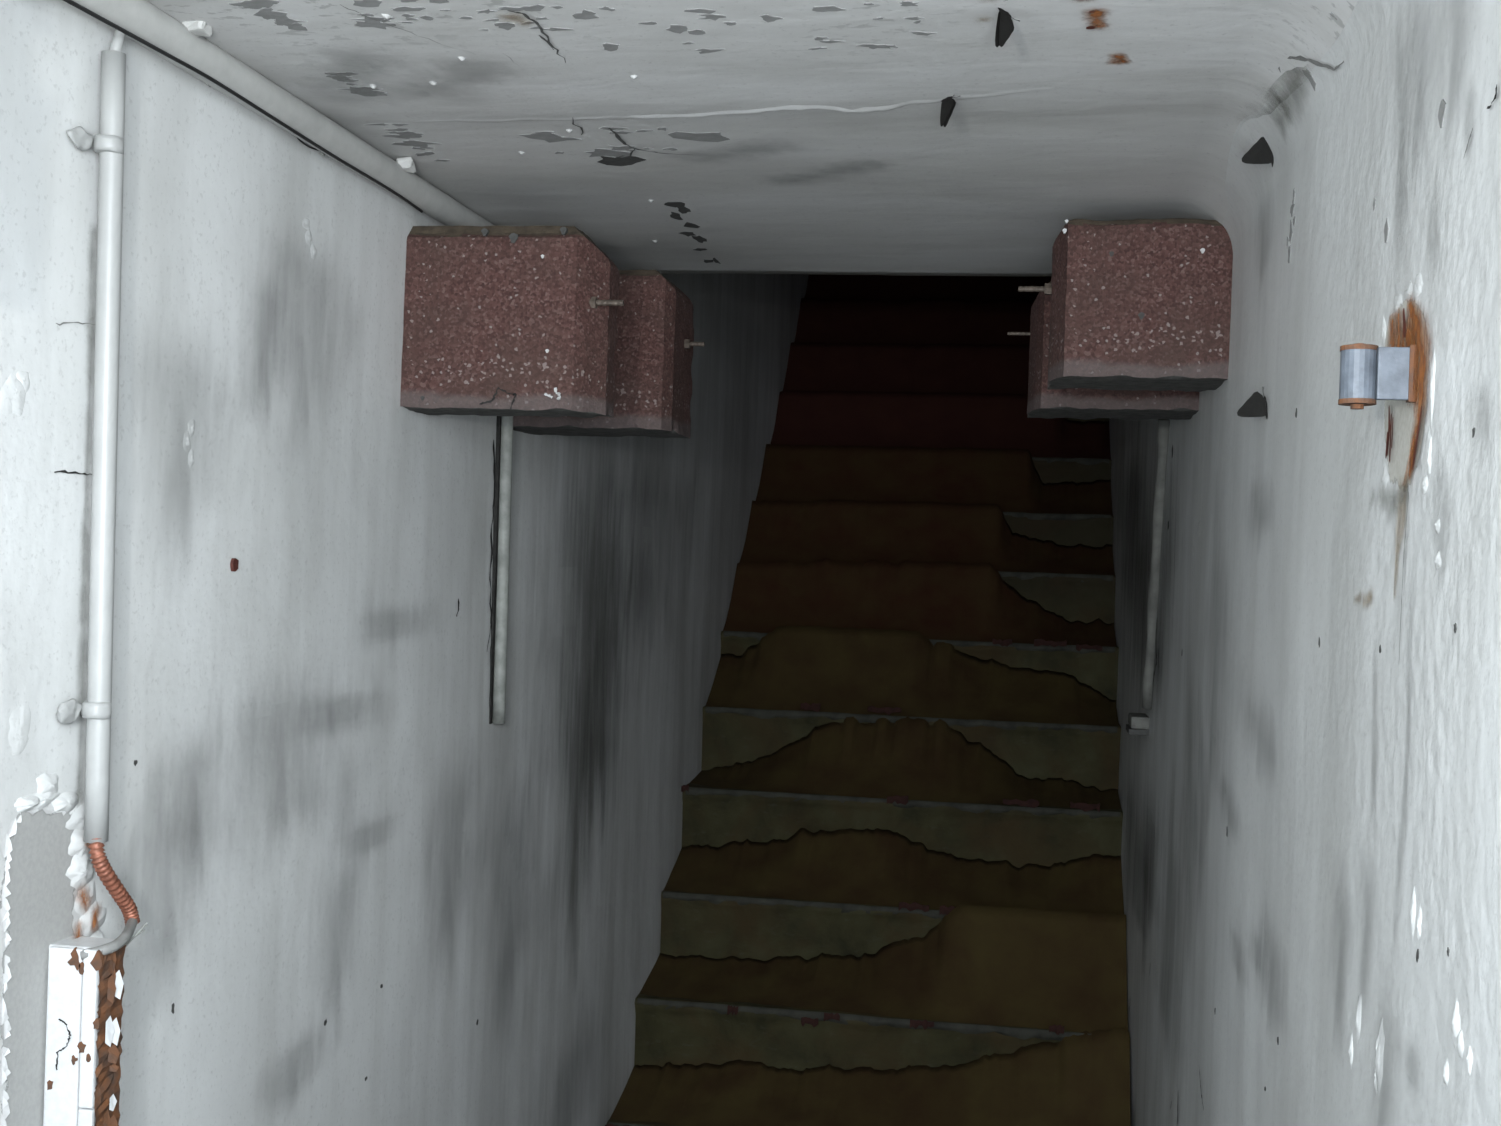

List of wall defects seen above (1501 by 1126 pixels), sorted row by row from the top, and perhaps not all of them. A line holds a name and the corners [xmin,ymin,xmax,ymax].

peeling [353,0,615,31]
peeling [603,43,619,51]
peeling [638,8,737,54]
peeling [760,14,783,22]
peeling [809,37,898,50]
peeling [899,1,935,36]
rust [1086,9,1106,29]
peeling [520,127,730,166]
rust [1338,299,1430,485]
rust [67,889,104,975]
rust [71,1018,101,1065]